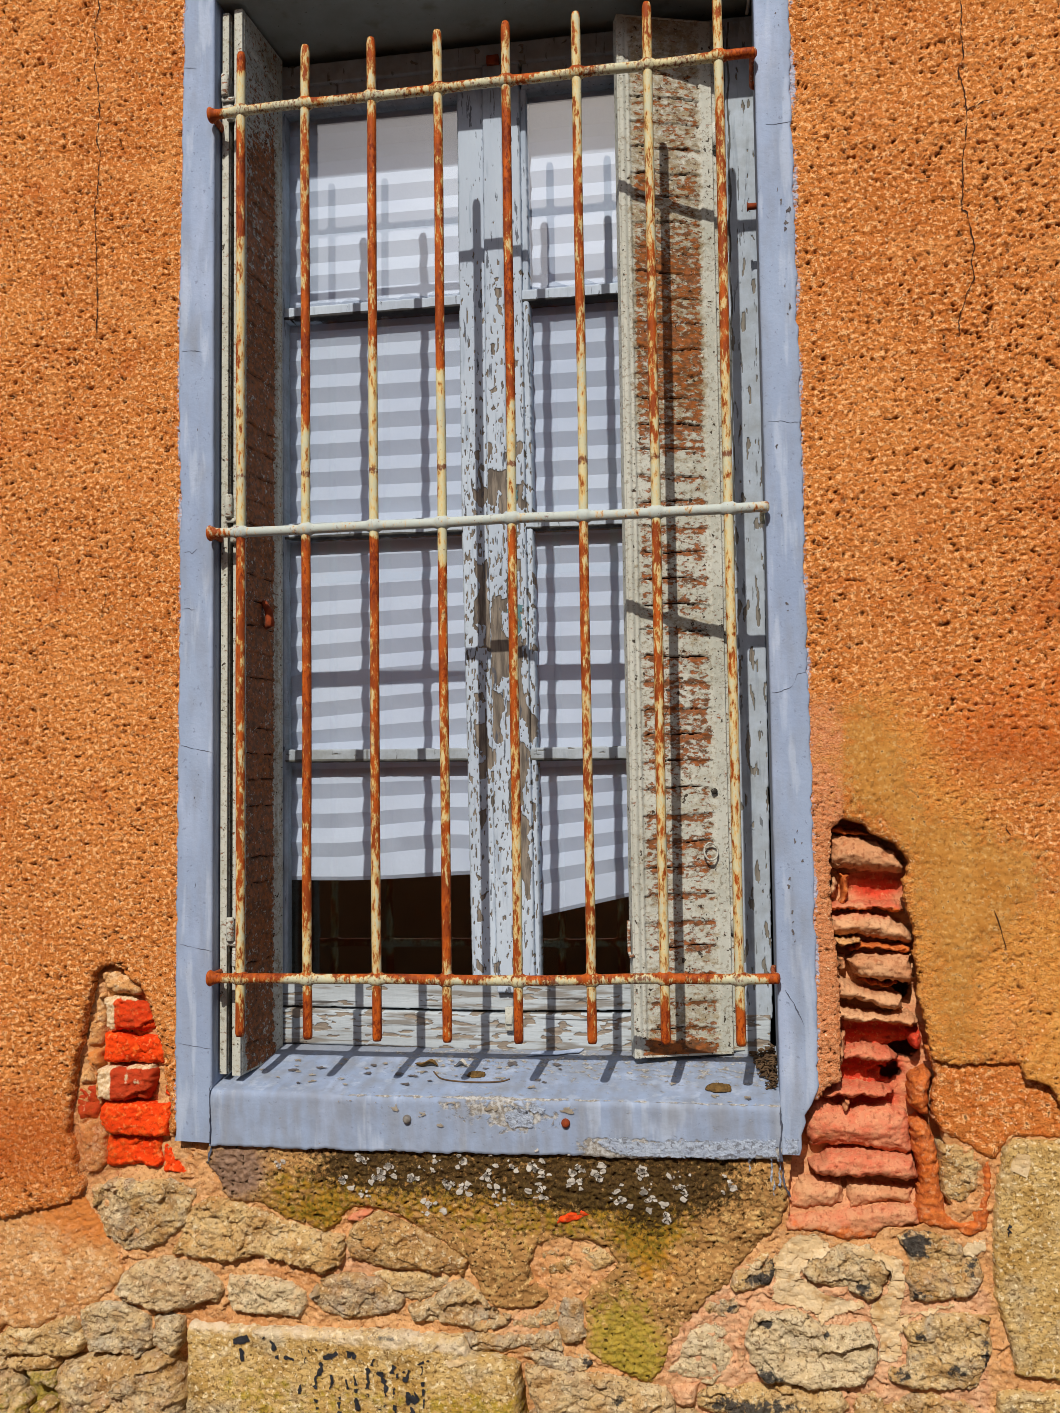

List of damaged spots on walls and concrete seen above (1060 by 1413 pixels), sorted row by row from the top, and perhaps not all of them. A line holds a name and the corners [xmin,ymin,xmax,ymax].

flaking render [592,705,1041,1240]
flaking render [77,965,186,1179]
peeling [260,1058,351,1102]
peeling [364,1060,466,1085]
spalling [347,1209,374,1221]
spalling [557,1210,589,1224]